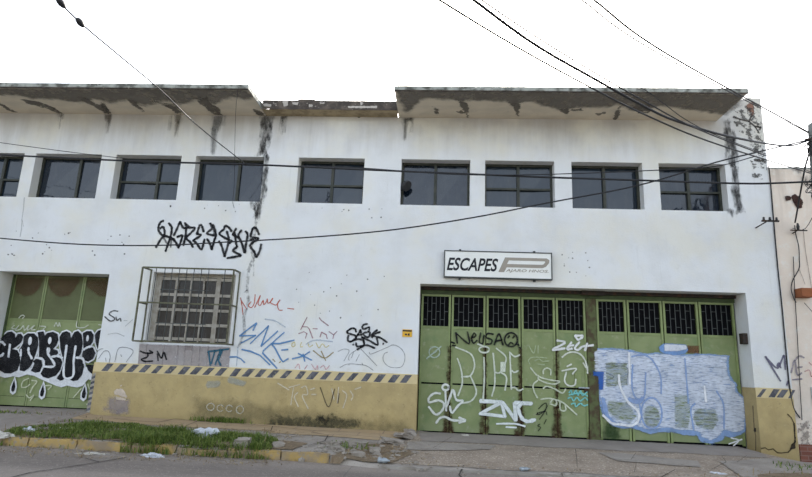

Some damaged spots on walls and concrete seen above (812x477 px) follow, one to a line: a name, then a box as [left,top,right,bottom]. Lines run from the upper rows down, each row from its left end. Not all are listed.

water stain [250,117,272,217]
water stain [724,104,767,214]